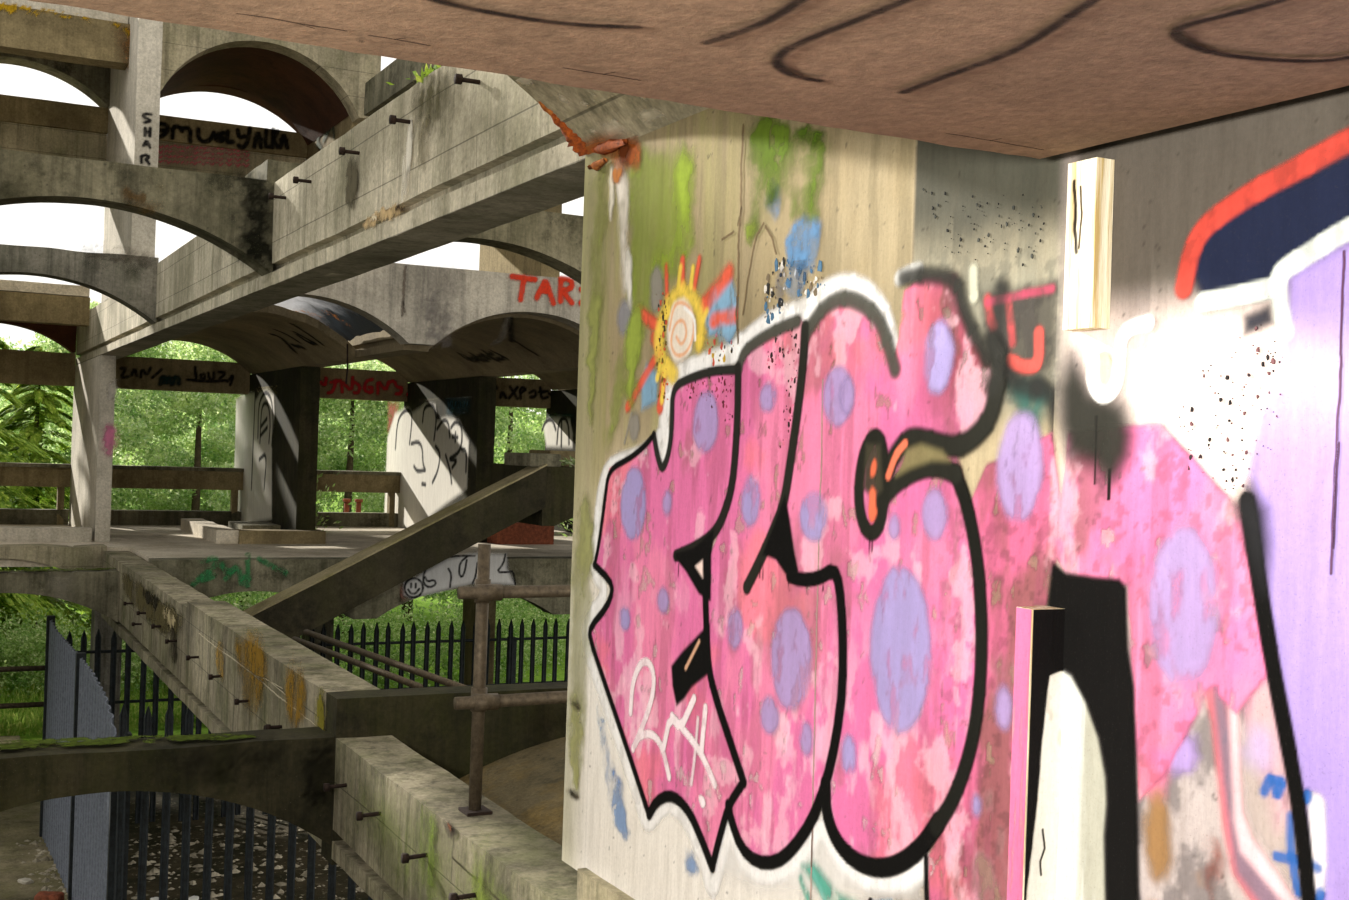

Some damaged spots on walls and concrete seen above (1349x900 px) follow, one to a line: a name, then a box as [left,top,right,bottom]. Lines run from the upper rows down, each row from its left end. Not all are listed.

corrosion [538,101,640,183]
leakage [238,173,275,270]